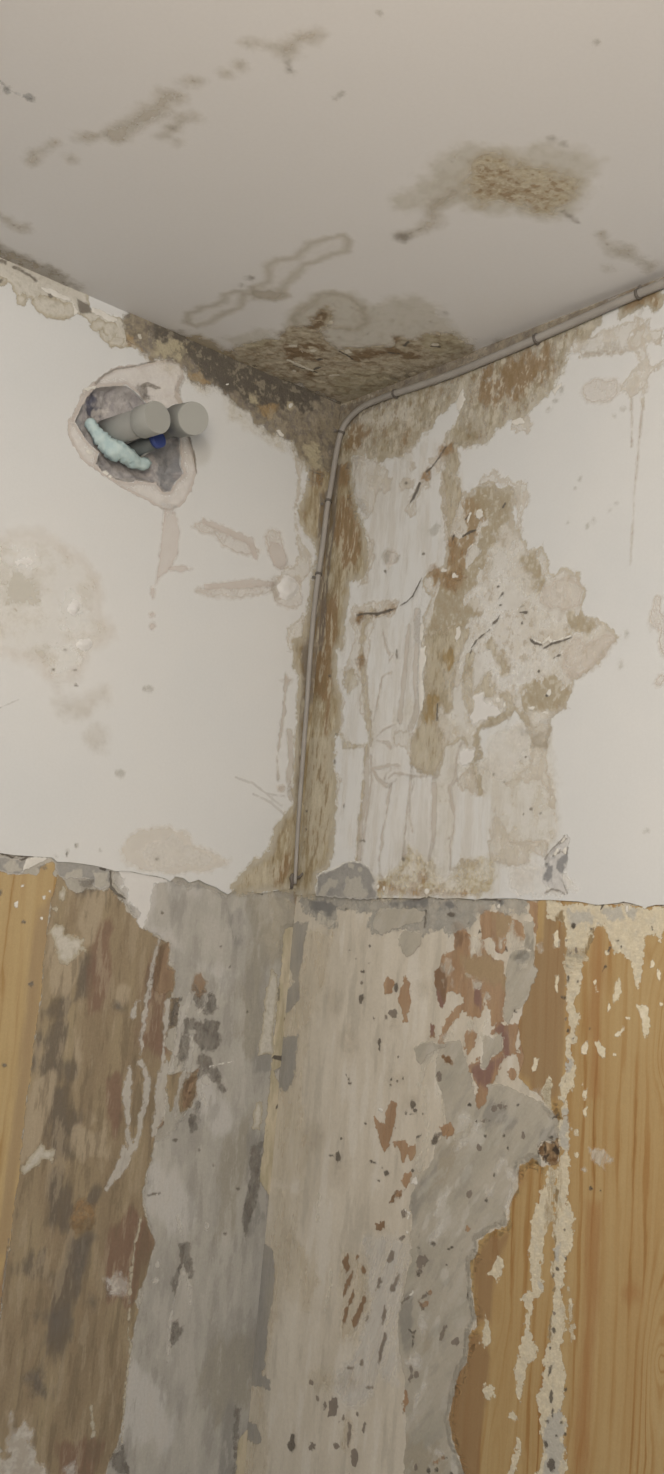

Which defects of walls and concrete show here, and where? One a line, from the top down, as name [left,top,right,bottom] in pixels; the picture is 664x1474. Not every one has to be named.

water stain [452,155,577,213]
spalling [0,258,197,510]
water stain [123,277,664,899]
flaking render [0,853,34,875]
flaking render [55,835,664,1474]